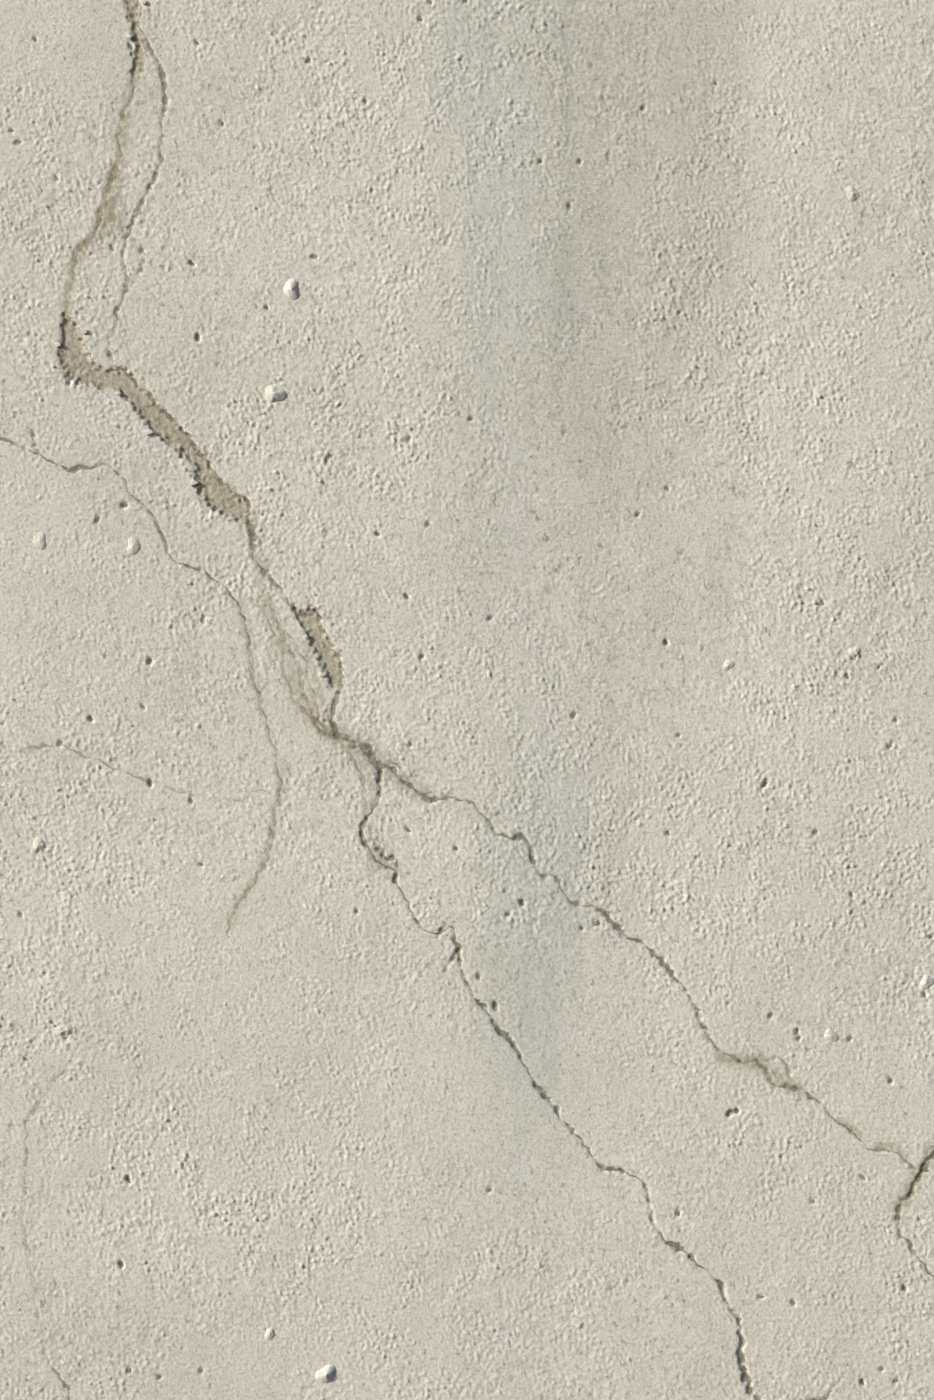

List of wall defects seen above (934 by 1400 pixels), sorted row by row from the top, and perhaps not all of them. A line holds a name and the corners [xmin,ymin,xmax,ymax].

crack [58,0,167,376]
crack [0,350,934,1400]